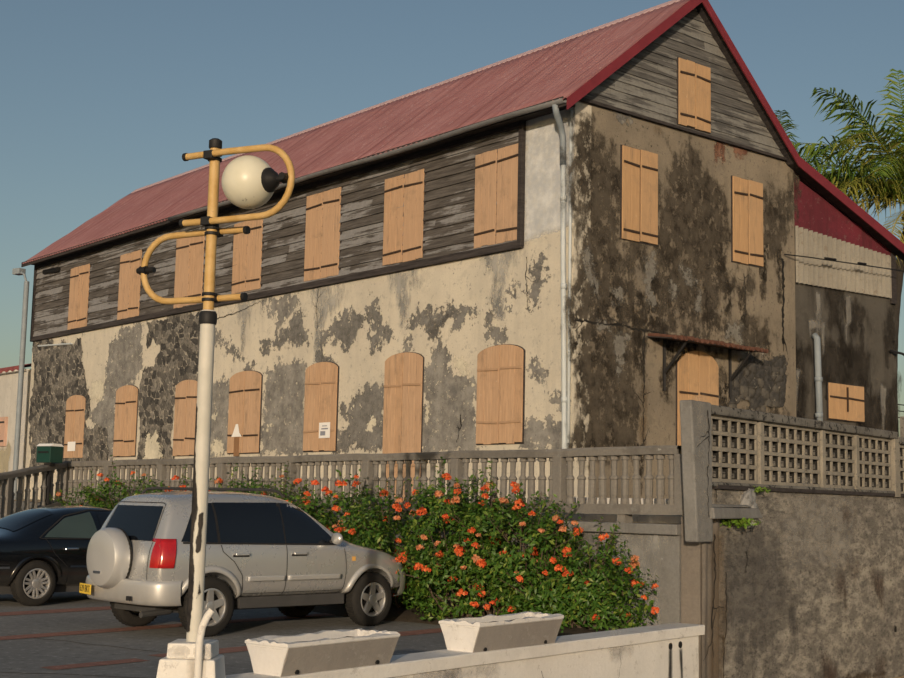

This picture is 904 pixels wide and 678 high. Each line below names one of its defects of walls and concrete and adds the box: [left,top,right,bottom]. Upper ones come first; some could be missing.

spalling [28,311,200,475]
peeling [210,373,230,458]
peeling [214,252,551,456]
peeling [518,356,571,461]
water stain [560,114,800,494]
water stain [769,288,901,432]
crack [697,410,749,678]